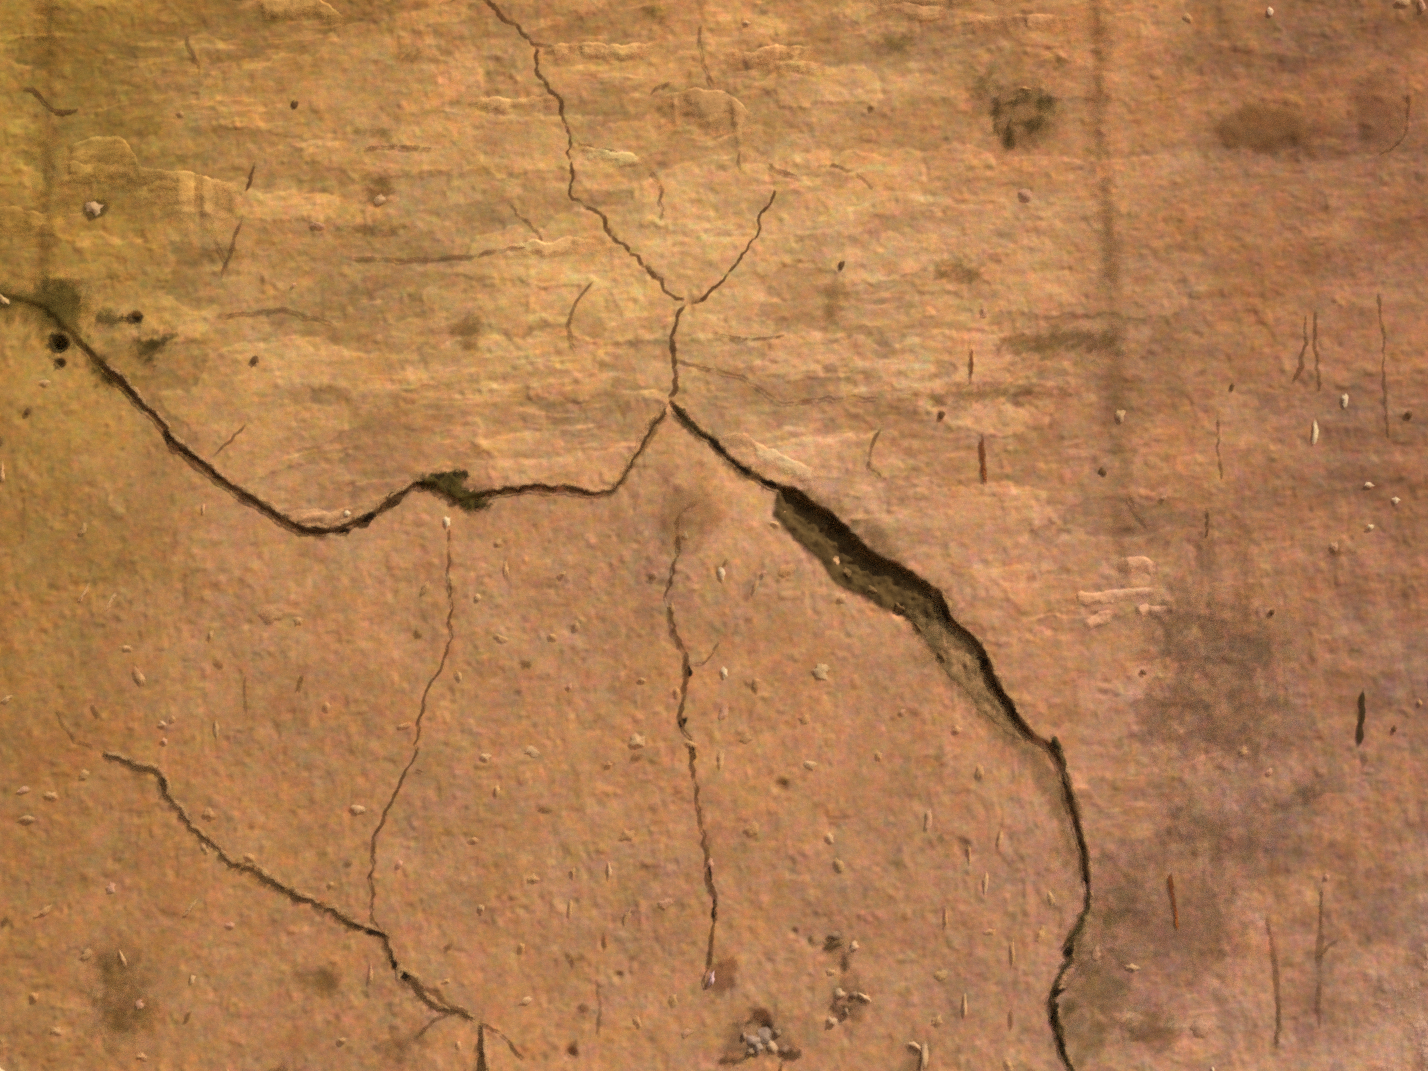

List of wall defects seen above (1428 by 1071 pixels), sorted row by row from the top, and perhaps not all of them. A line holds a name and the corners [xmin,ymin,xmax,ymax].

crack [25,87,78,115]
crack [367,142,431,150]
crack [246,166,255,190]
crack [215,224,241,274]
crack [355,205,542,262]
crack [447,0,881,496]
crack [227,307,333,324]
crack [102,364,426,534]
crack [665,502,720,988]
crack [56,529,524,1071]
crack [937,591,1094,1071]